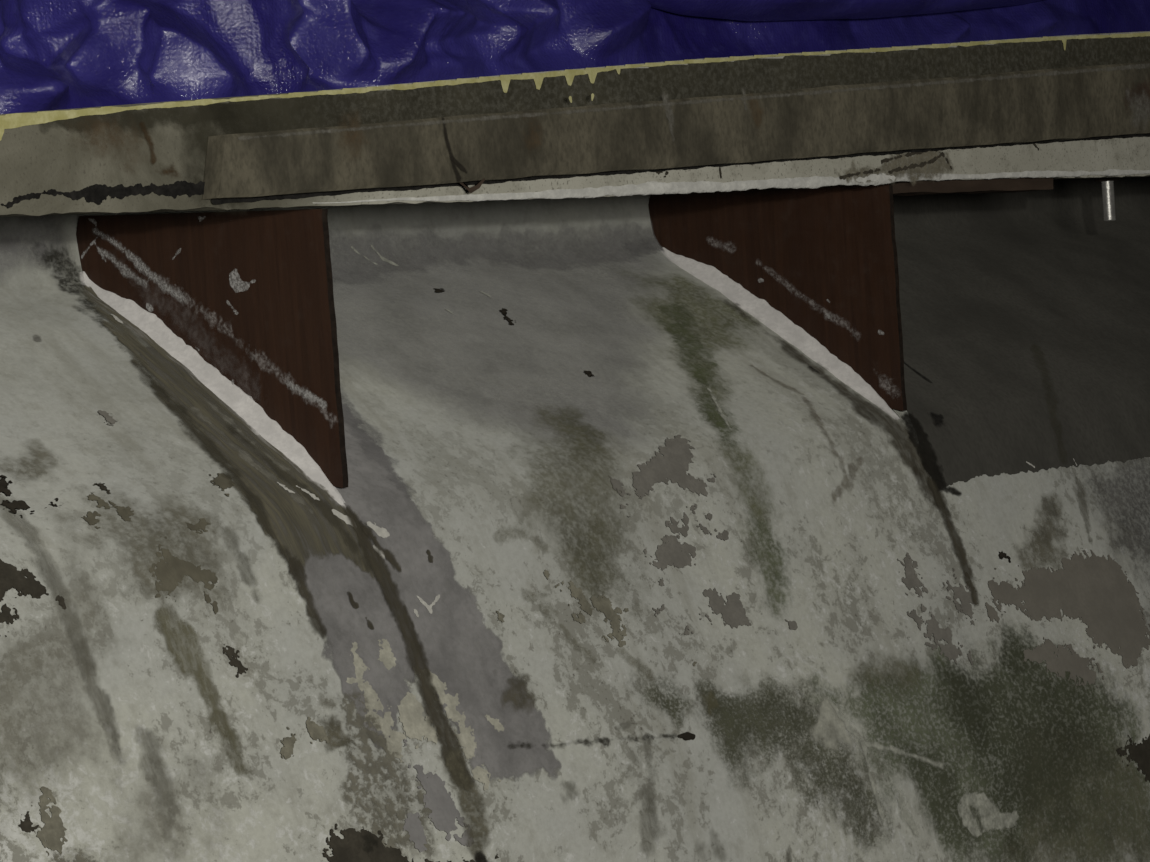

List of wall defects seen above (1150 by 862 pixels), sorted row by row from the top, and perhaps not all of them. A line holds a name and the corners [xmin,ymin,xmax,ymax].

crack [1,181,205,208]
peeling [0,475,62,518]
peeling [0,559,66,637]
leakage [82,482,244,772]
leakage [136,364,489,862]
peeling [201,404,561,862]
peeling [609,435,729,586]
peeling [679,588,752,635]
leakage [747,488,785,609]
peeling [943,548,1150,688]
crack [511,732,695,748]
peeling [19,786,96,862]